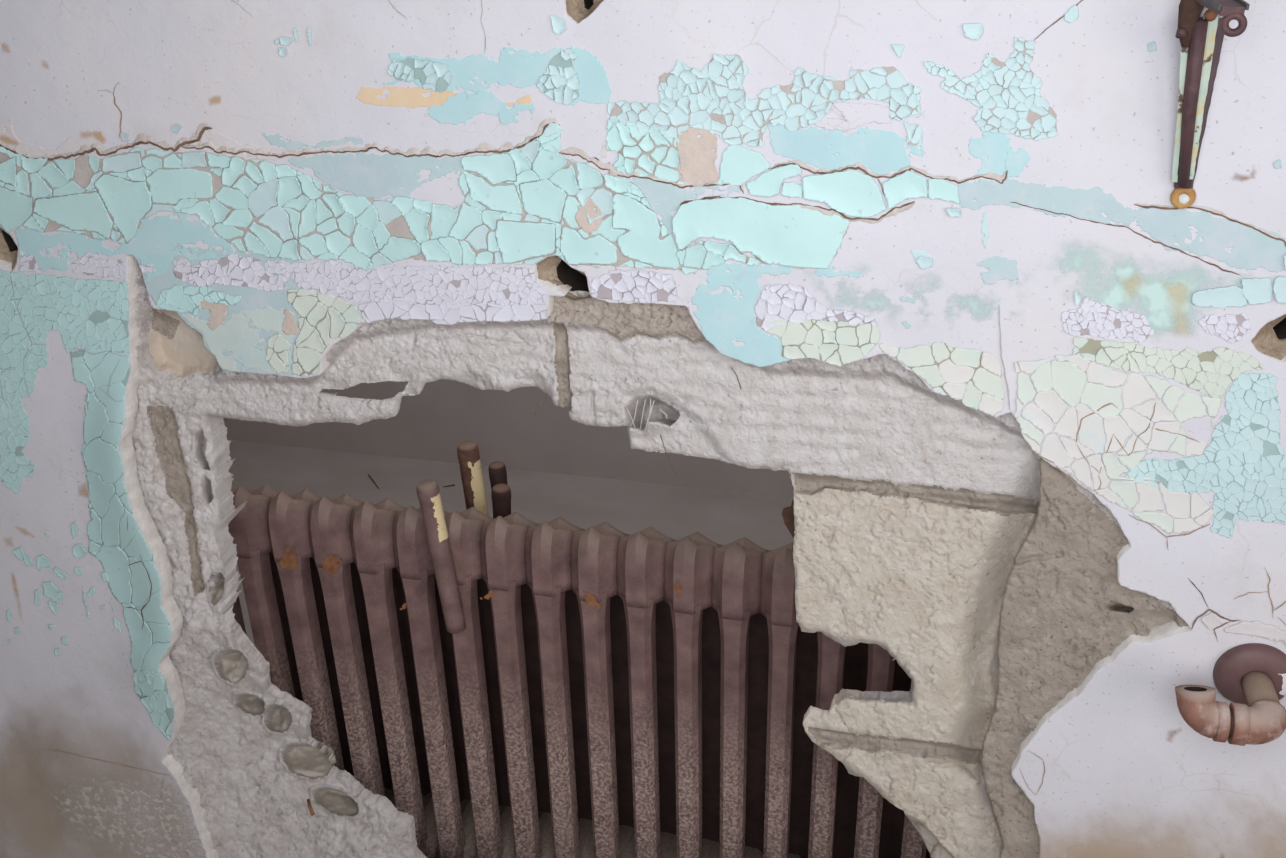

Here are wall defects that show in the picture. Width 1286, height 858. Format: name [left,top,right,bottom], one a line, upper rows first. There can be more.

spalling [550,0,603,35]
peeling [0,46,924,306]
crack [0,82,1286,275]
peeling [882,37,1286,273]
peeling [0,270,130,494]
crack [1032,403,1201,494]
peeling [12,522,121,656]
spalling [132,250,1286,858]
crack [1129,515,1209,549]
crack [1188,569,1286,641]
damp [0,741,205,858]